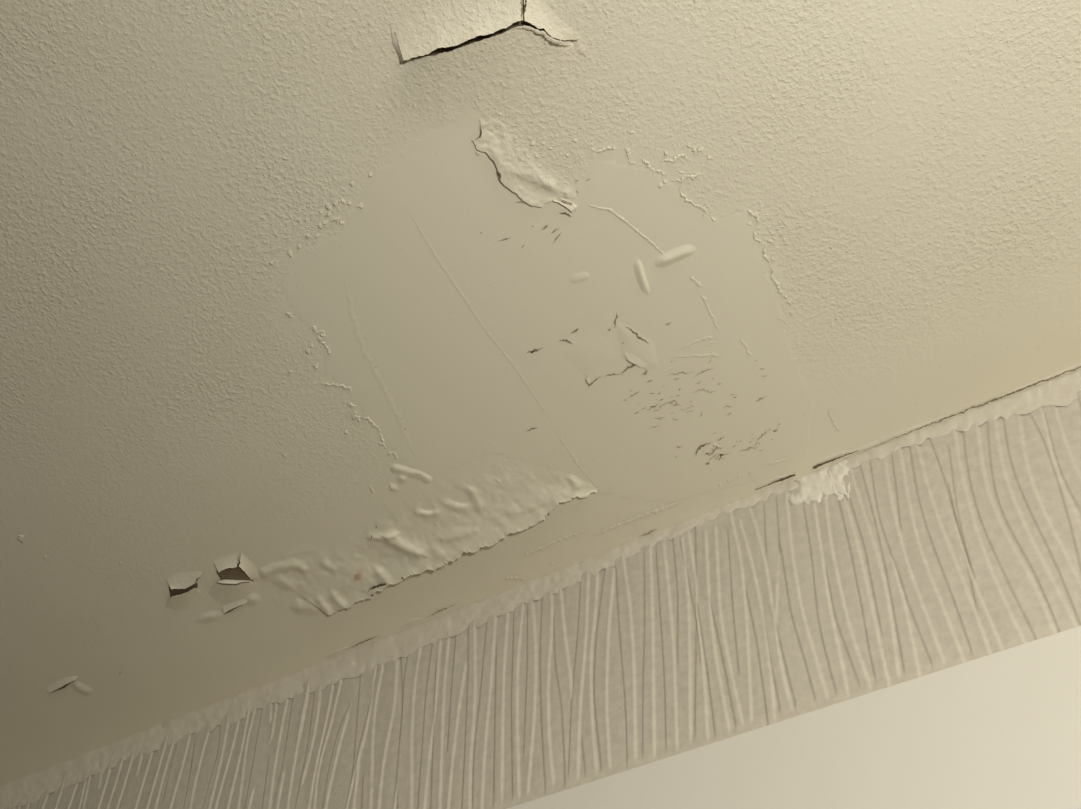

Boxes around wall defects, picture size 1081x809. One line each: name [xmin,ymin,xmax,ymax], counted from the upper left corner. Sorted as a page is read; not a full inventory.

peeling [377,0,587,217]
peeling [608,314,659,375]
peeling [165,571,202,611]
peeling [217,456,598,618]